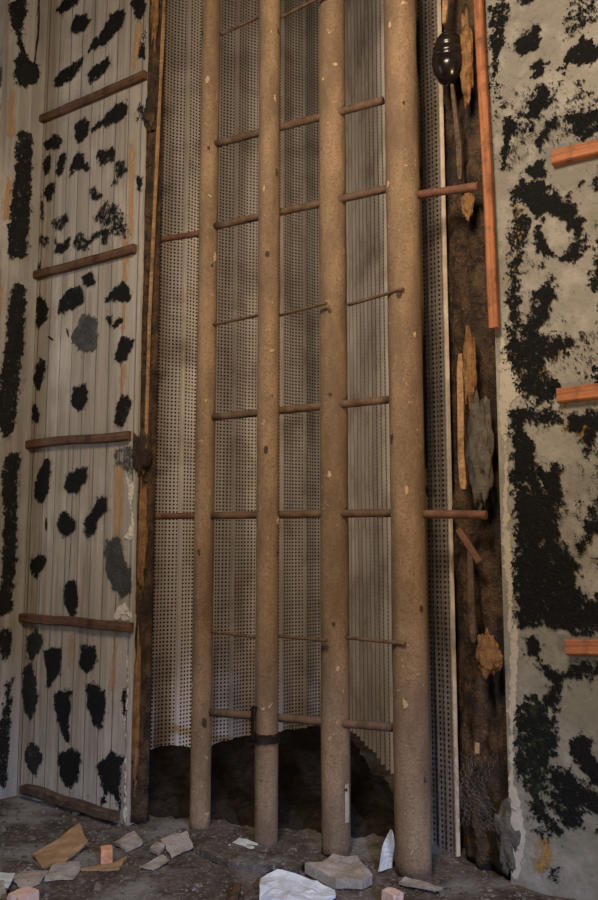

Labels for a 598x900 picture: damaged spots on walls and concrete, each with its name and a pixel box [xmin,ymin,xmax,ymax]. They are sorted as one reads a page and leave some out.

leakage [561,0,598,42]
leakage [489,61,598,172]
leakage [501,224,598,569]